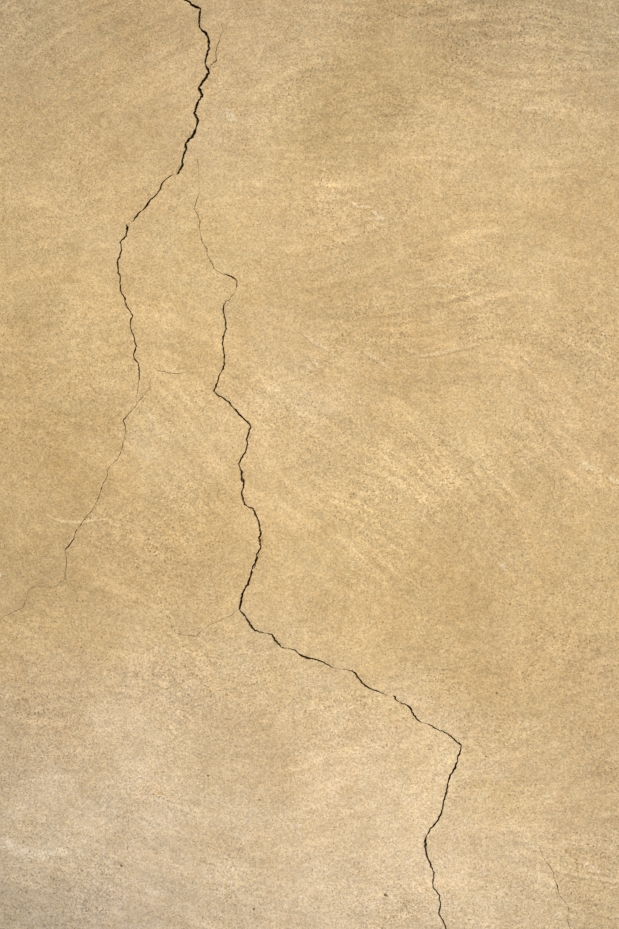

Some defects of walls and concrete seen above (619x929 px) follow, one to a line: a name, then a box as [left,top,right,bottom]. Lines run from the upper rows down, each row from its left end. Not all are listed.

crack [0,0,462,929]